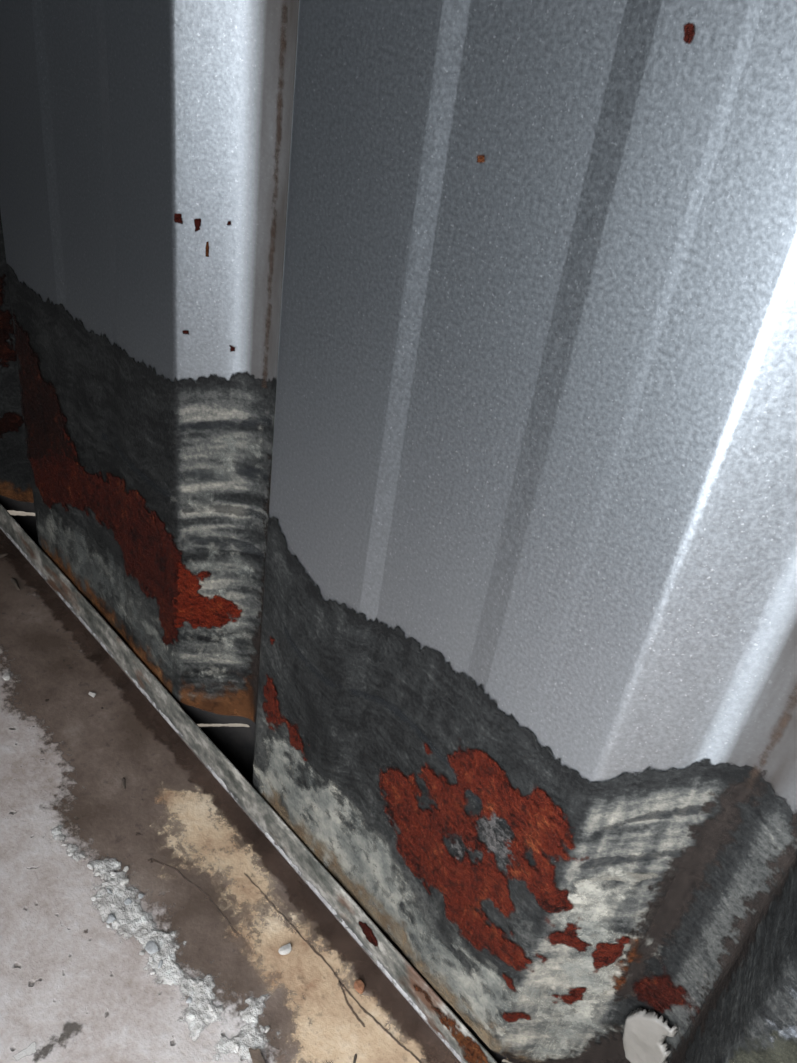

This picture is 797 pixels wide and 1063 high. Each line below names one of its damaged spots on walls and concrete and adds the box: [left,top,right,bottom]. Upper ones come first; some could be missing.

rust [683,23,695,44]
rust [174,214,201,231]
damp [0,211,277,703]
rust [0,274,699,1063]
damp [0,554,411,1063]
damp [252,512,797,1063]
spalling [52,824,224,1041]
spalling [215,994,280,1063]
peeling [622,1007,678,1063]